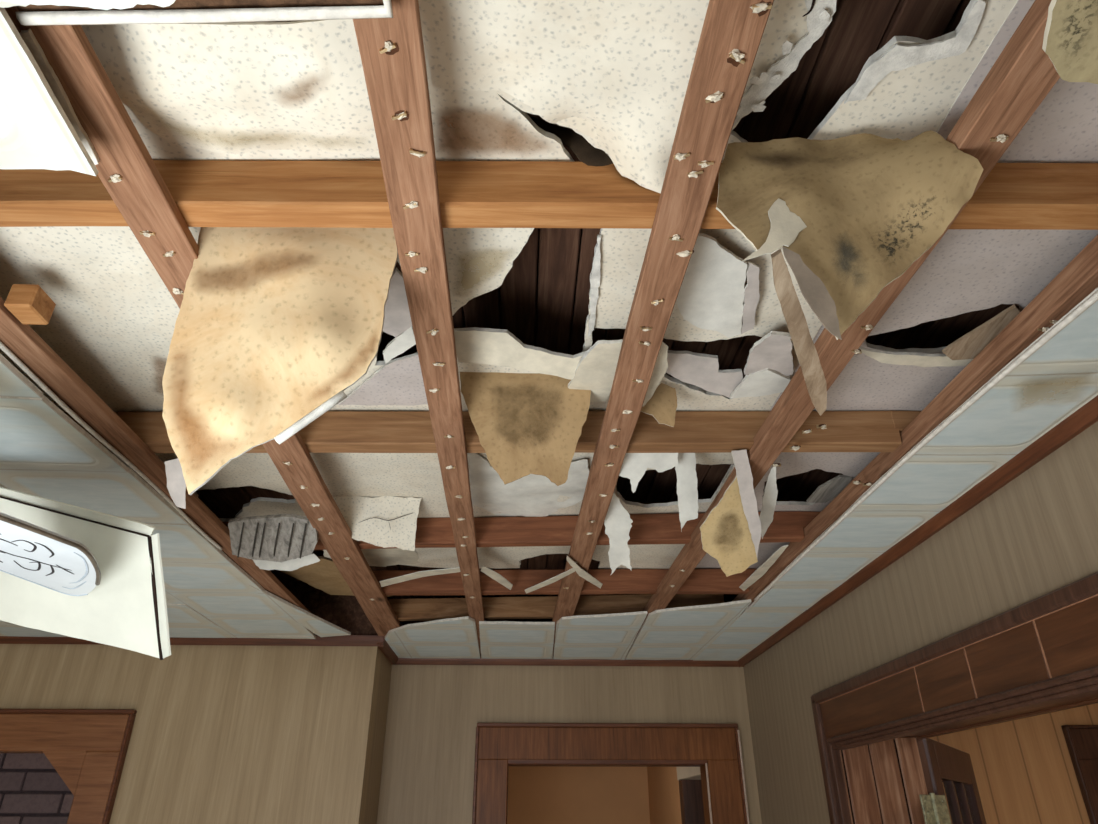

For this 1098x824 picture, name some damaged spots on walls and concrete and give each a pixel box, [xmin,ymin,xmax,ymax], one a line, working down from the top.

peeling [0,0,175,10]
flaking render [733,0,836,126]
flaking render [844,0,986,104]
leakage [879,204,928,256]
flaking render [588,234,602,337]